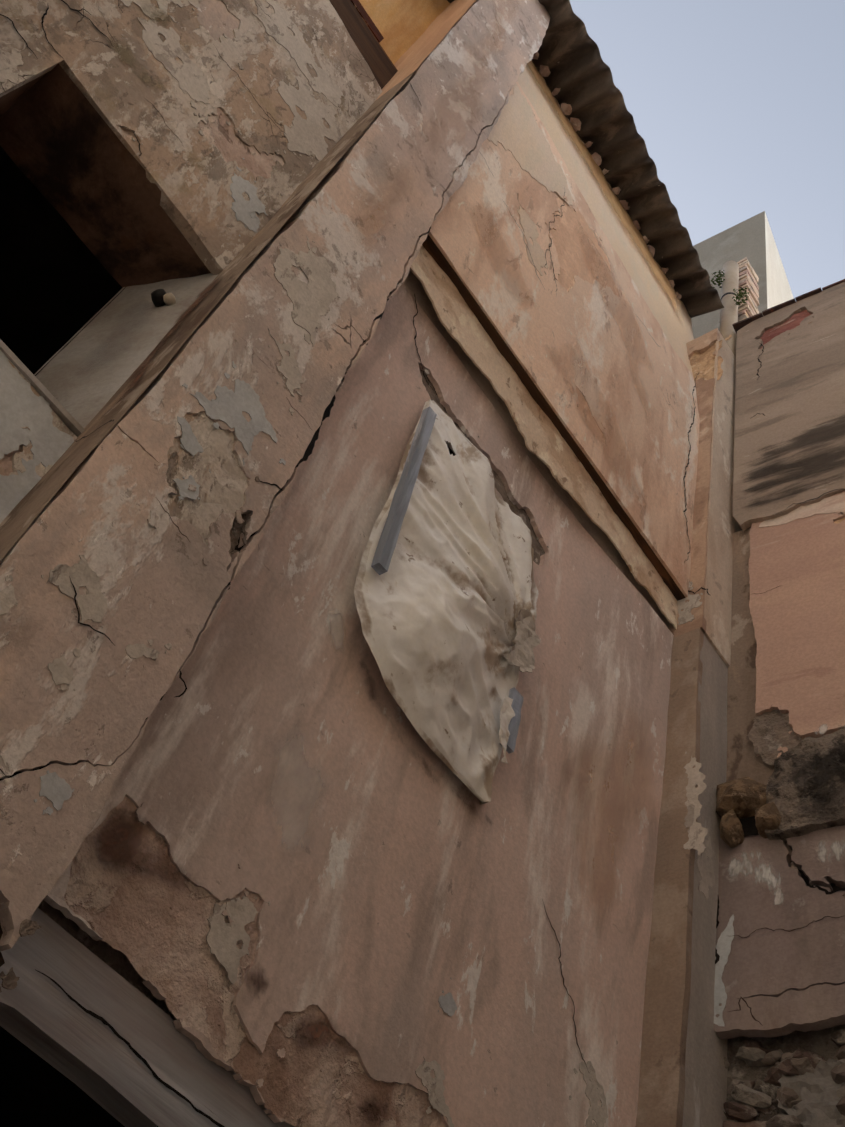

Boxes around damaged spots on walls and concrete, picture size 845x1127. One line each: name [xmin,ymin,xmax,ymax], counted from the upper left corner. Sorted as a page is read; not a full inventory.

peeling [98,0,348,237]
flaking render [756,310,814,349]
peeling [0,350,74,524]
flaking render [147,361,278,566]
crack [683,373,699,563]
damp [745,417,845,505]
peeling [41,555,107,625]
crack [0,763,78,781]
damp [802,725,845,808]
flaking render [64,796,446,1127]
crack [729,997,763,1026]
crack [715,860,845,964]